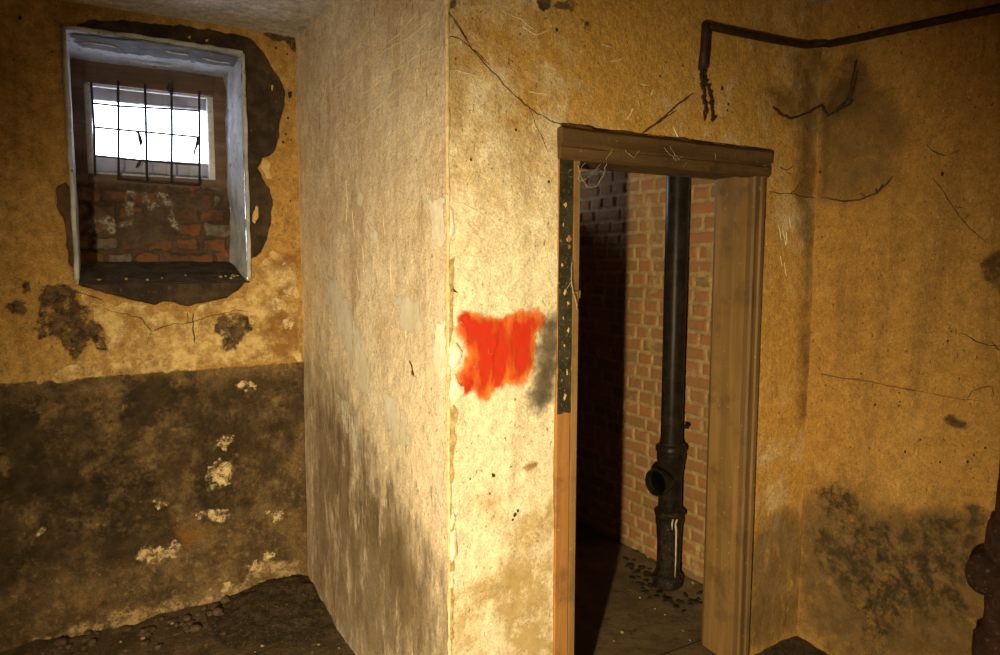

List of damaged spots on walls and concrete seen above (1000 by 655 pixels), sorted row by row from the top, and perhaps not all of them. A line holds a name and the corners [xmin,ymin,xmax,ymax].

crack [449,12,599,149]
peeling [7,19,302,385]
crack [770,166,893,202]
crack [933,178,986,242]
crack [77,292,246,344]
leakage [0,376,301,586]
leakage [32,560,300,641]
leakage [312,409,425,655]
leakage [750,489,984,655]